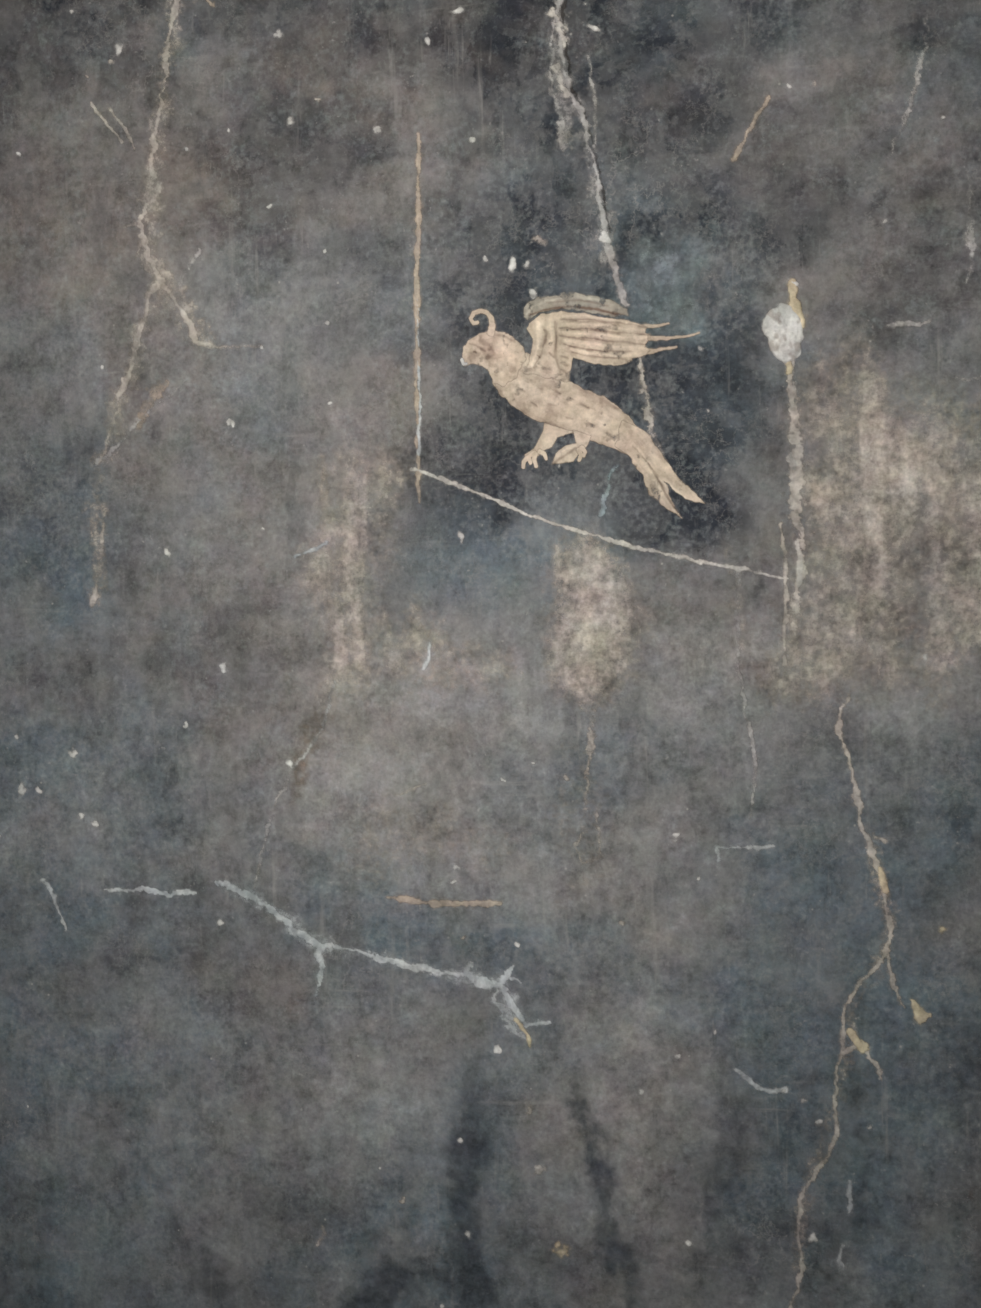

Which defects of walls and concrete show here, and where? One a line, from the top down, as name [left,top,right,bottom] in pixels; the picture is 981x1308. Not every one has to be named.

crack [92,0,261,465]
crack [547,0,630,307]
crack [85,496,107,607]
crack [637,357,663,453]
crack [104,681,551,1047]
crack [789,694,932,1308]
damp [446,1117,496,1308]